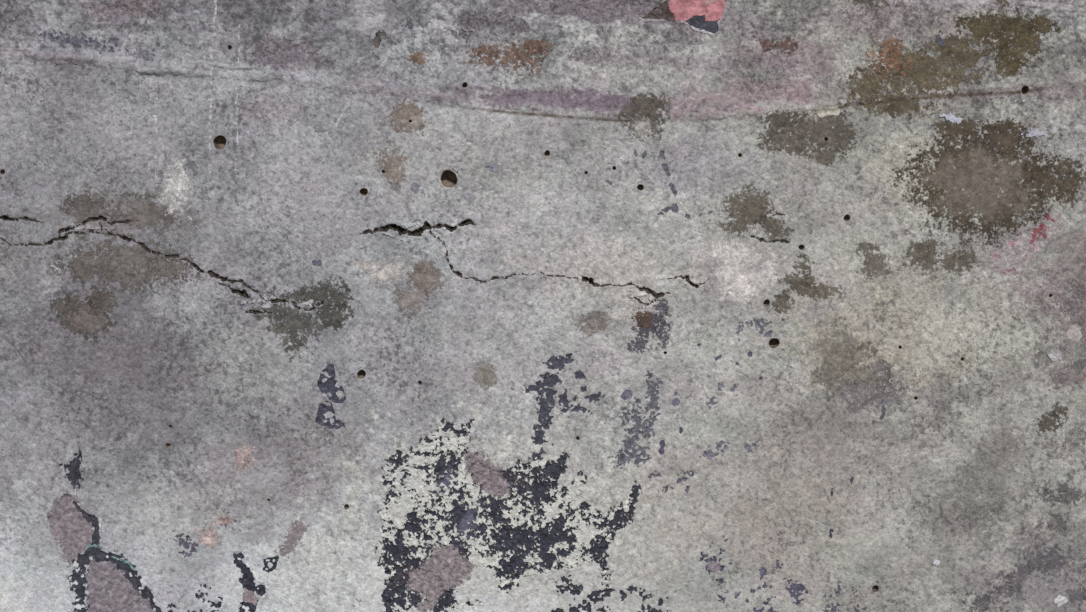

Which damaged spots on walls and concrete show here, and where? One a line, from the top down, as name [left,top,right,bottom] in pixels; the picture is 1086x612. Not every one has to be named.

peeling [639,0,728,35]
damp [757,0,1086,280]
crack [0,215,325,315]
crack [360,218,710,306]
peeling [315,362,346,429]
peeling [706,382,738,410]
peeling [375,353,694,612]
peeling [699,441,730,461]
peeling [47,450,223,612]
peeling [231,520,309,612]